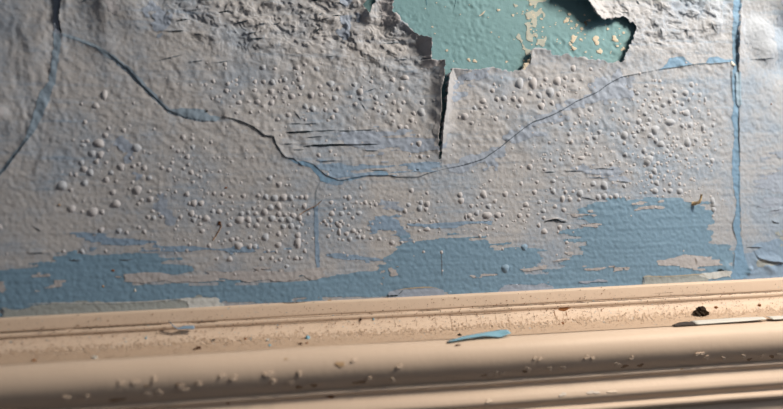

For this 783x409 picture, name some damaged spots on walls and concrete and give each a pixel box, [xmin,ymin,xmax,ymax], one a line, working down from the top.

peeling [377,0,636,159]
crack [0,0,783,326]
crack [0,324,163,339]